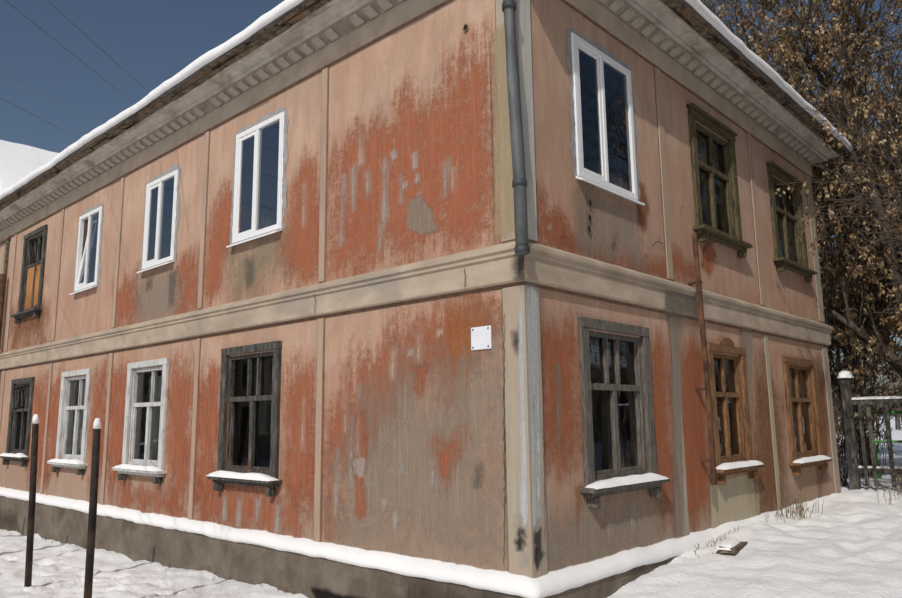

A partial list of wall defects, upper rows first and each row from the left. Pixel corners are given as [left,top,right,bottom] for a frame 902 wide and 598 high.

peeling [279,37,501,287]
peeling [88,292,503,539]